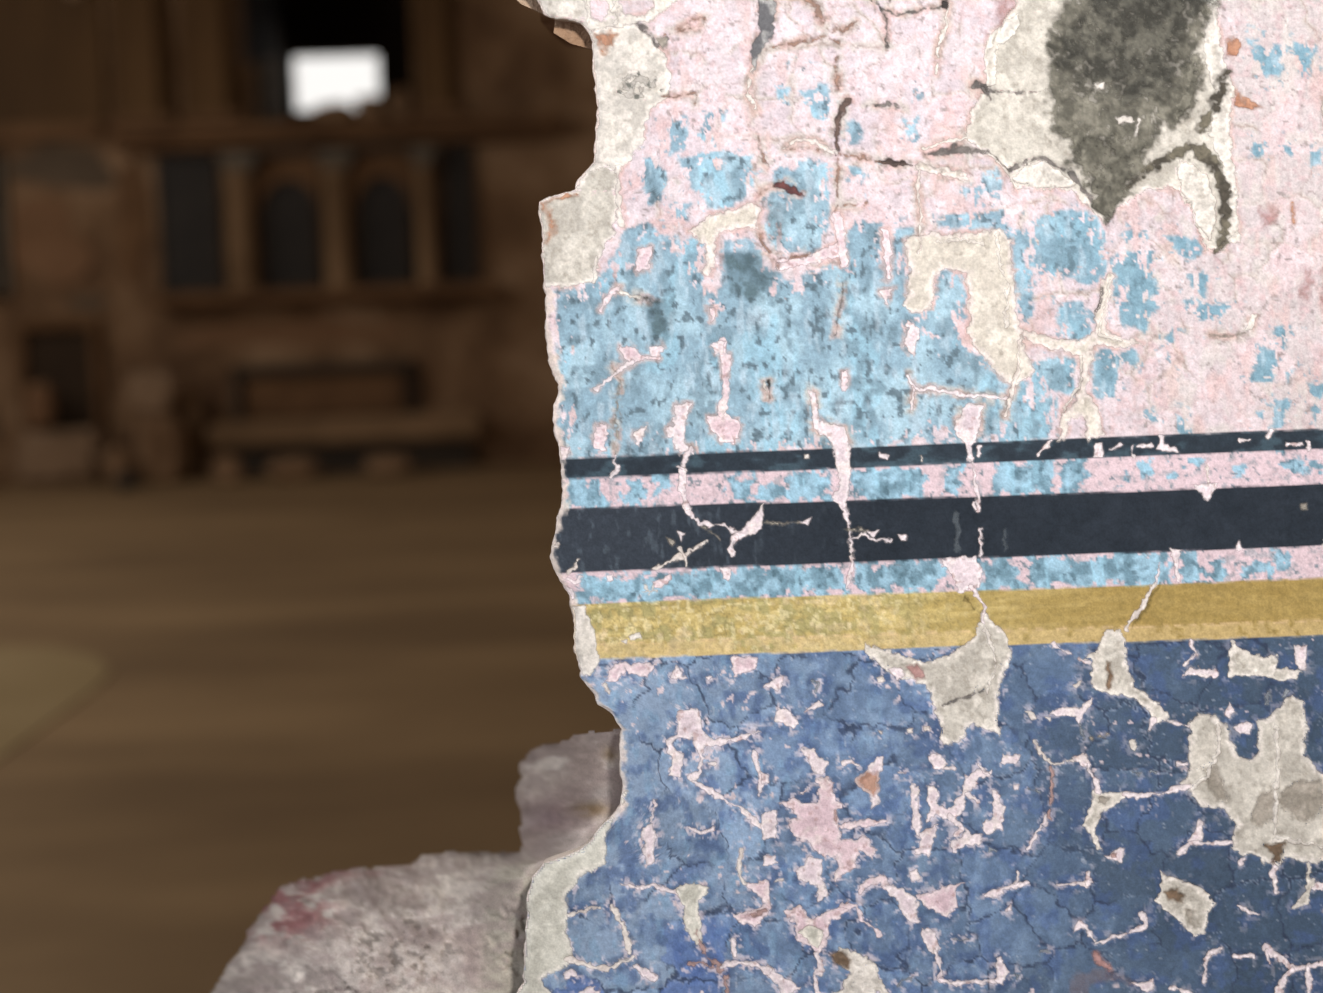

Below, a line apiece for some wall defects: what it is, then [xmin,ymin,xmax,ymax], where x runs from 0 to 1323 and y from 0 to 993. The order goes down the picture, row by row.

flaking render [539,0,677,288]
crack [746,0,1093,254]
leakage [1046,0,1232,254]
peeling [666,402,694,454]
peeling [707,337,741,444]
crack [652,390,906,588]
flaking render [879,228,1178,457]
peeling [565,559,656,694]
spalling [211,729,627,993]
flaking render [666,611,1020,993]
flaking render [1026,629,1323,865]
flaking render [1154,871,1215,937]